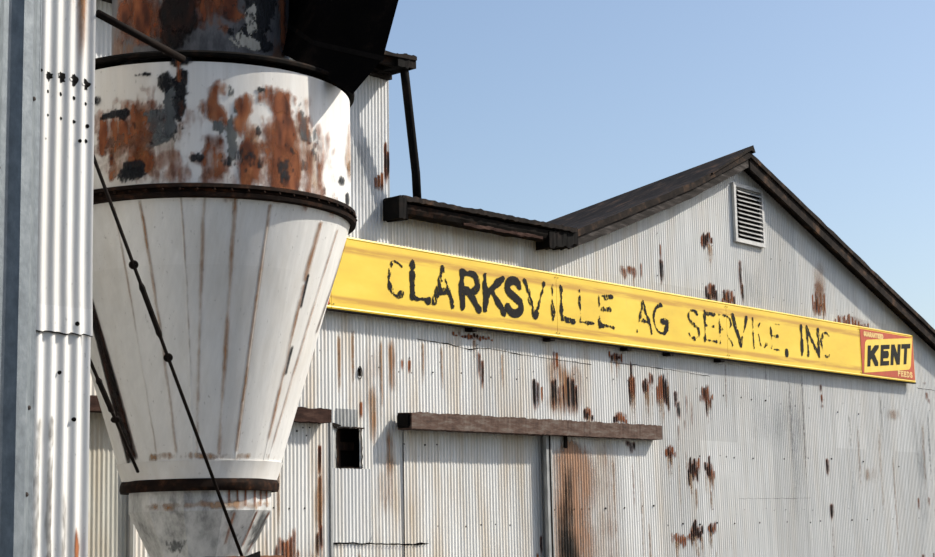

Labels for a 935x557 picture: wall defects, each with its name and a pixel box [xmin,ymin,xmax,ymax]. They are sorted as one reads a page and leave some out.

corrosion [117,0,246,50]
corrosion [94,101,181,182]
corrosion [192,81,330,192]
corrosion [812,283,826,316]
corrosion [556,440,596,557]
corrosion [665,446,715,505]
corrosion [275,532,299,557]
corrosion [674,519,716,549]